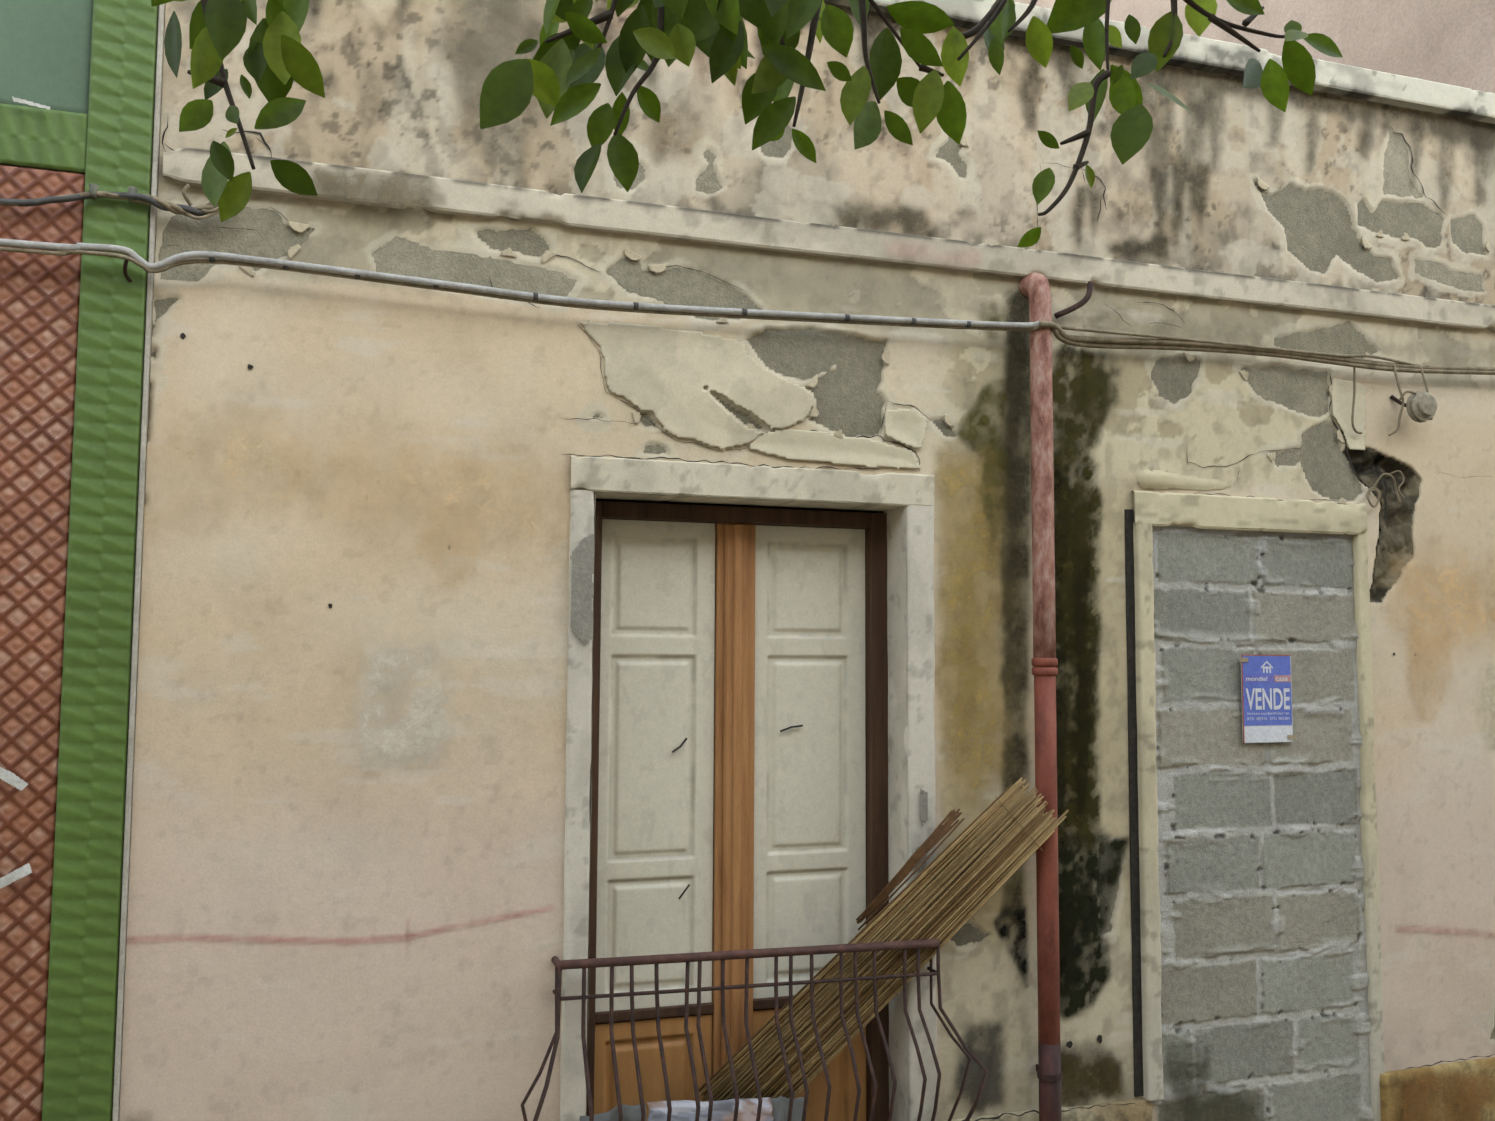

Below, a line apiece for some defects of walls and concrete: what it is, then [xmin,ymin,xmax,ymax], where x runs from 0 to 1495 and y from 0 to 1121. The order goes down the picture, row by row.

leakage [1008,35,1040,126]
leakage [312,168,438,210]
peeling [372,228,577,299]
spalling [607,248,762,323]
leakage [1076,188,1098,238]
leakage [1111,66,1263,258]
spalling [1253,132,1490,292]
crack [560,325,930,471]
spalling [747,328,889,439]
spalling [1151,352,1200,404]
flaking render [1239,321,1421,602]
leakage [1055,484,1100,817]